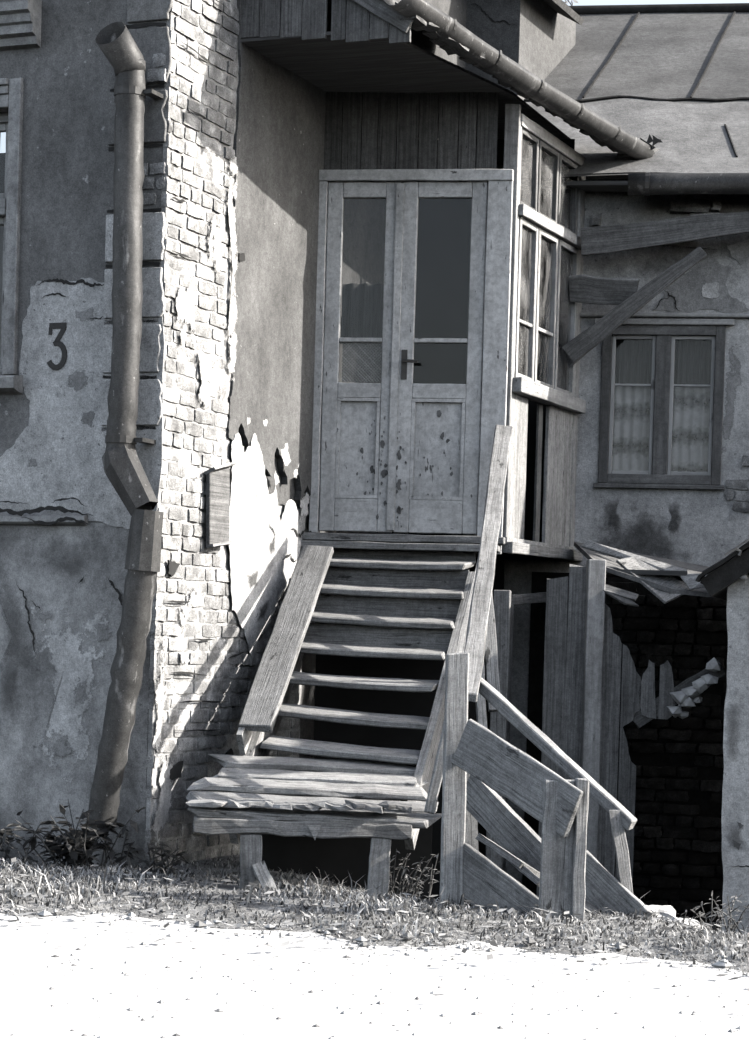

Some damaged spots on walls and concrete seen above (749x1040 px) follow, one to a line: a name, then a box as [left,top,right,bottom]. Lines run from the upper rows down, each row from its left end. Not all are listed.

flaking render [0,277,131,529]
flaking render [136,316,165,511]
flaking render [723,455,749,521]
spalling [228,417,310,667]
leakage [605,504,680,559]
crack [18,587,40,658]
crack [79,577,122,605]